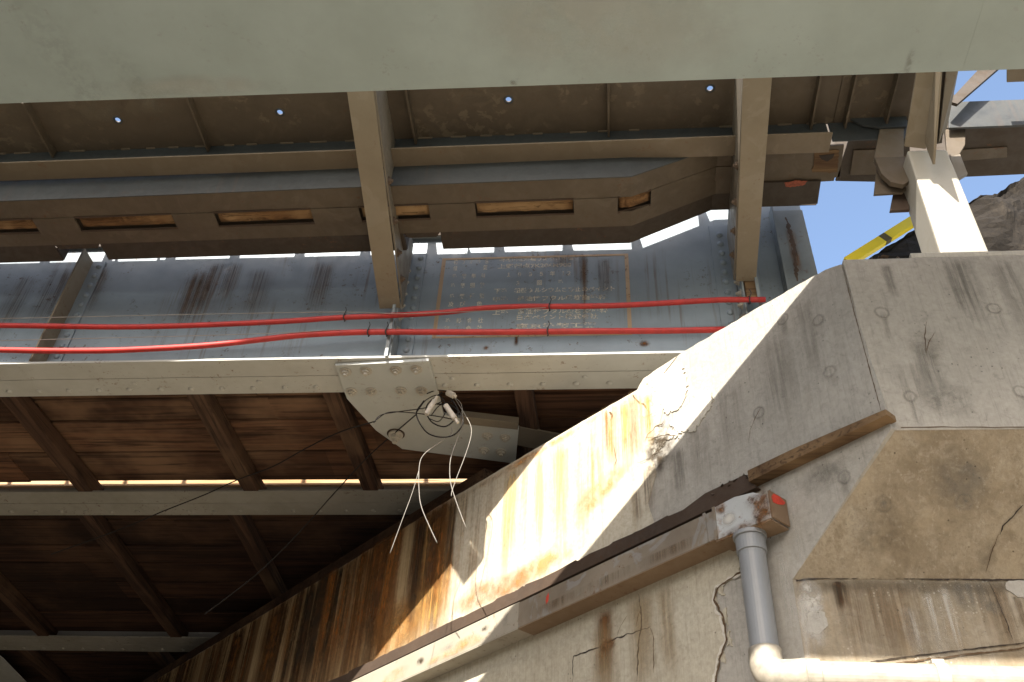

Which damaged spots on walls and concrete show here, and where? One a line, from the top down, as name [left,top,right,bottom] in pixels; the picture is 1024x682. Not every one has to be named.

corrosion [785,217,799,281]
corrosion [605,397,651,453]
crack [633,395,676,441]
peeling [636,366,715,467]
corrosion [728,494,768,536]
crack [796,505,1024,663]
crack [572,594,654,675]